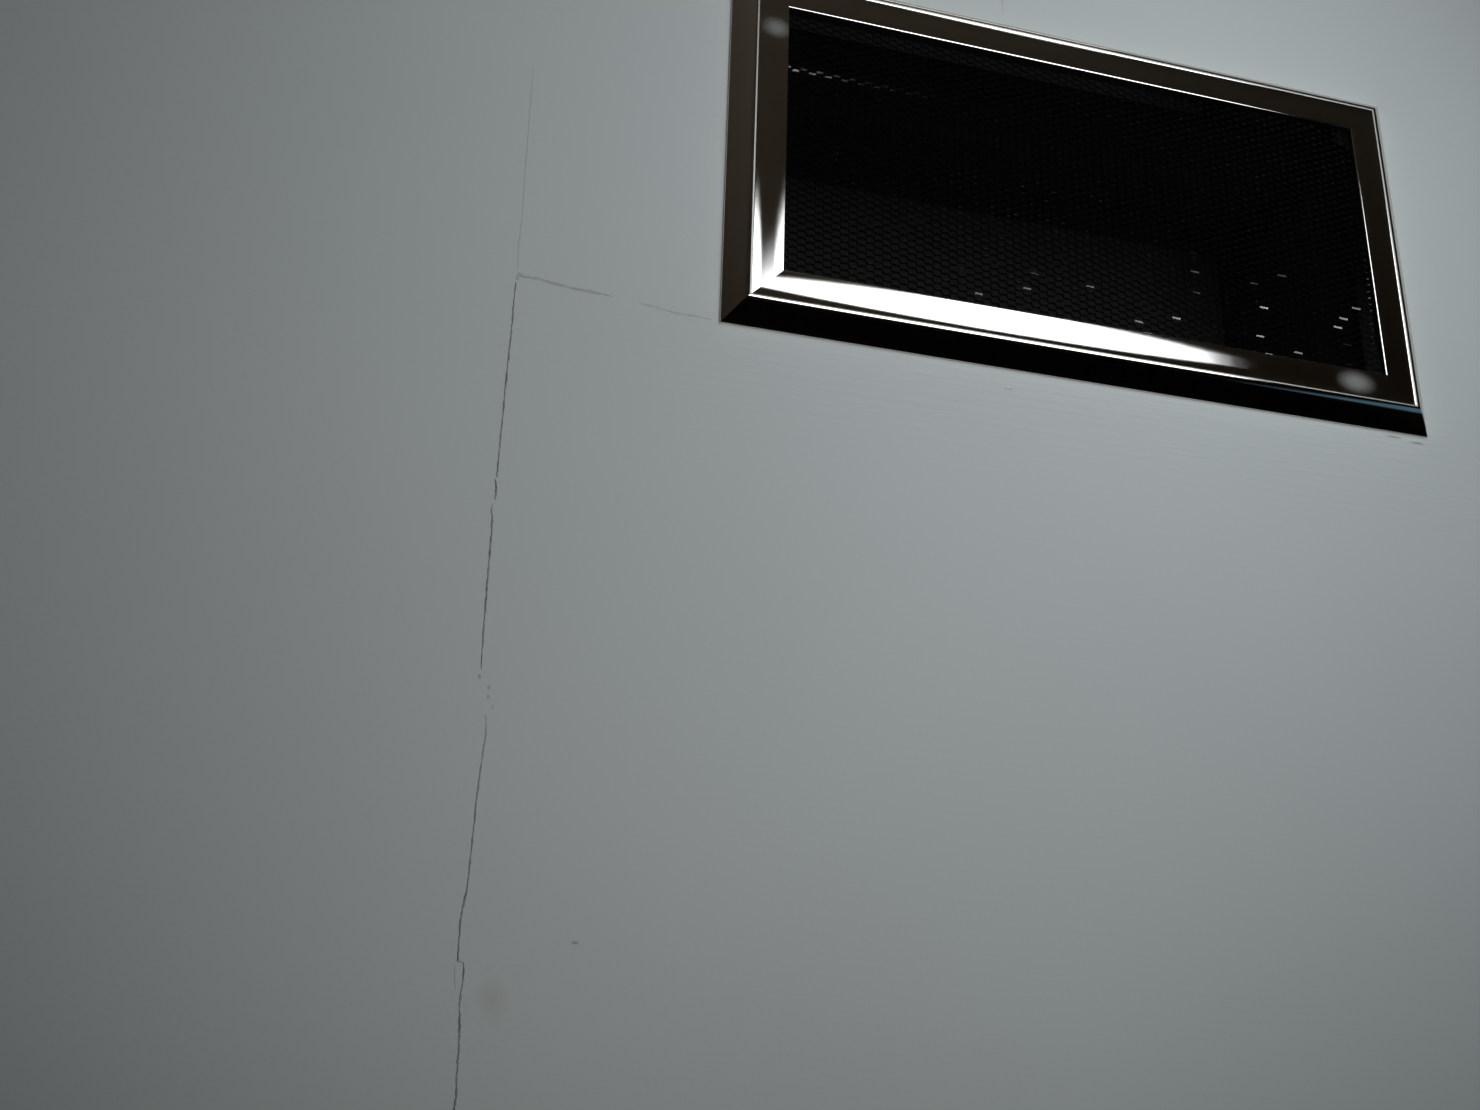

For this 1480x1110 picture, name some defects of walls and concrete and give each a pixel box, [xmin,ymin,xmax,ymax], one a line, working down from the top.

crack [453,67,712,1110]